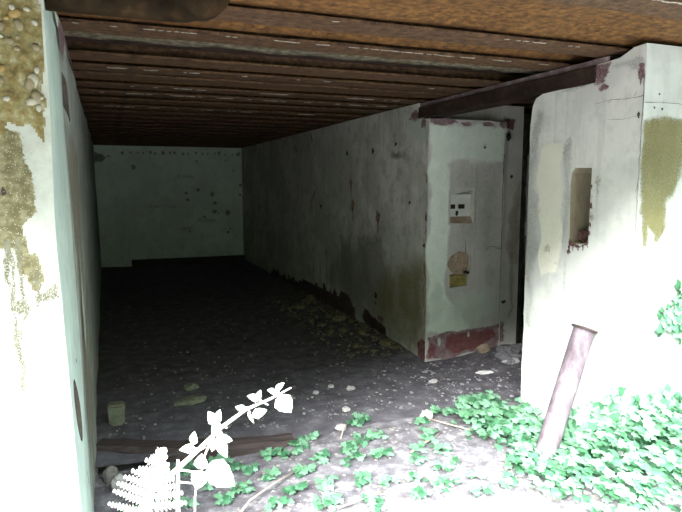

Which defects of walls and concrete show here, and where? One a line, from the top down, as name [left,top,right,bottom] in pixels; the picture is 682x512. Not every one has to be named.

peeling [594,55,645,92]
water stain [2,237,59,393]
spalling [271,267,386,336]
peeling [403,109,516,361]
water stain [638,115,682,248]